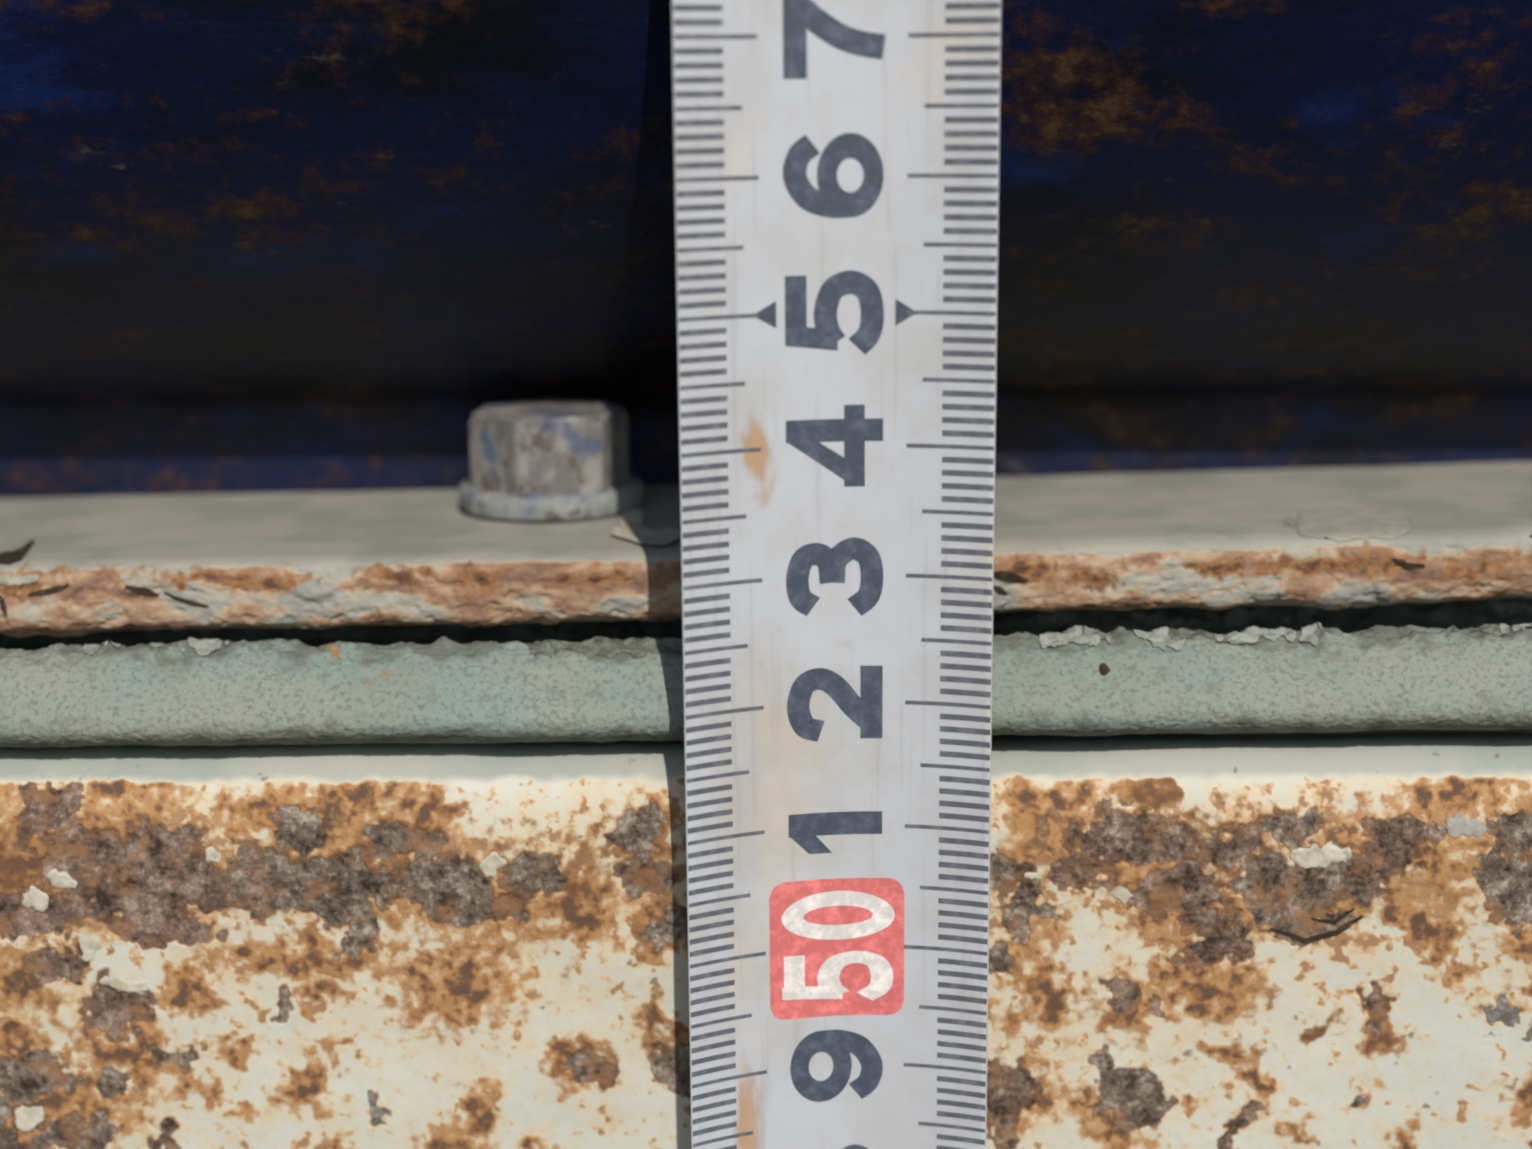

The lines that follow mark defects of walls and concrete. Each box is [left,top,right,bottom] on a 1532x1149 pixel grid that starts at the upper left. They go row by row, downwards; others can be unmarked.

corrosion [1184,541,1426,580]
peeling [0,781,568,1075]
corrosion [0,779,689,1149]
corrosion [987,778,1317,1149]
peeling [989,799,1532,974]
corrosion [1310,775,1532,1011]
corrosion [1300,1008,1343,1044]
corrosion [1361,1018,1406,1058]
peeling [0,1049,146,1149]
peeling [147,1117,181,1149]
peeling [1081,1045,1179,1140]
peeling [1217,1100,1265,1149]